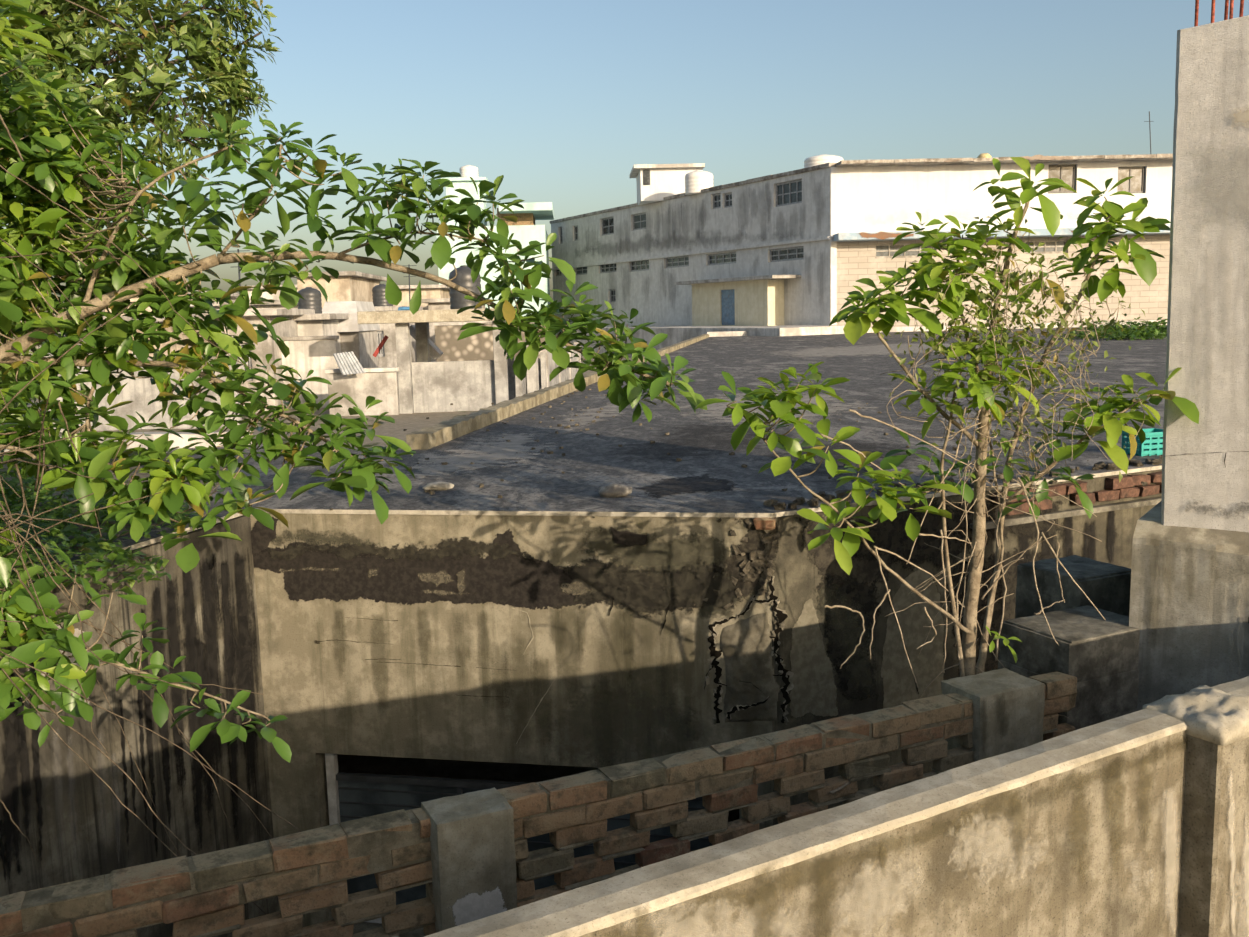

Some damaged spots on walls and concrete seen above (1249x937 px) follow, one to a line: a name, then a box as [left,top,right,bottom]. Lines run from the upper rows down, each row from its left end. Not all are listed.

damp [265,529,535,562]
peeling [250,517,781,612]
damp [562,525,741,618]
damp [119,553,259,856]
damp [0,662,43,879]